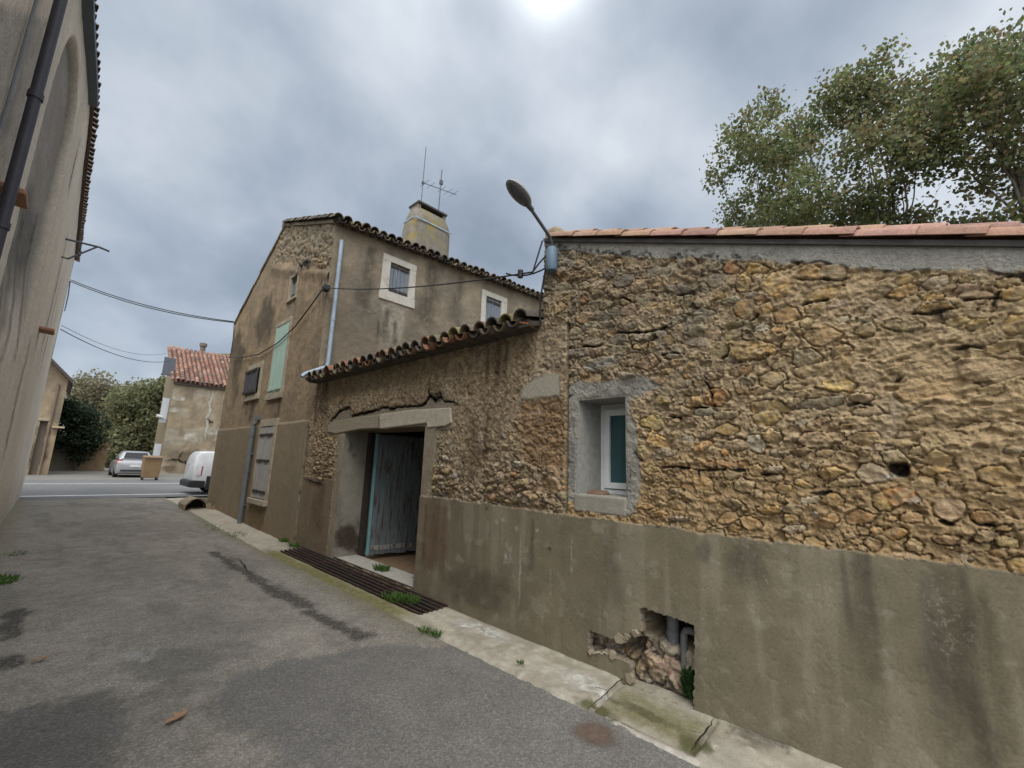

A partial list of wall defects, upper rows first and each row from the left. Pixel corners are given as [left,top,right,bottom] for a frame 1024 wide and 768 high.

crack [165,391,214,464]
crack [333,387,457,427]
spalling [587,607,695,709]